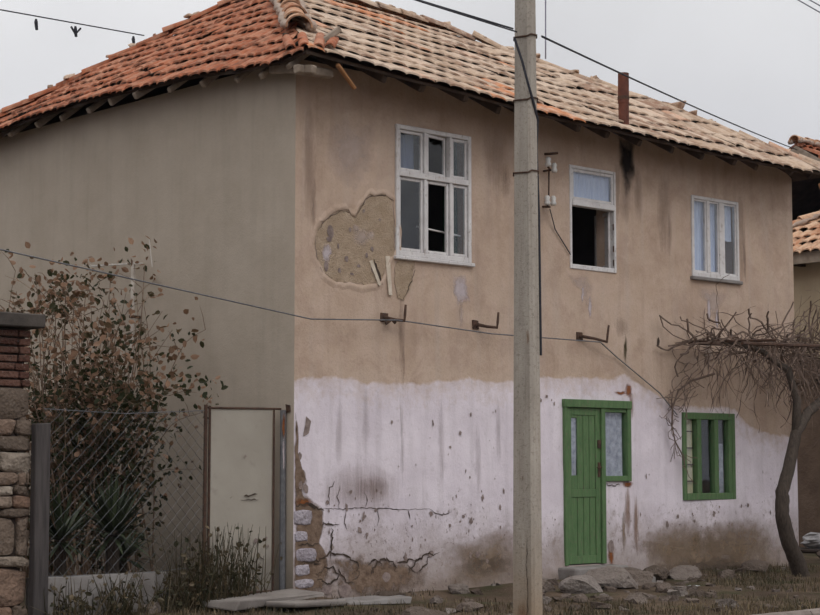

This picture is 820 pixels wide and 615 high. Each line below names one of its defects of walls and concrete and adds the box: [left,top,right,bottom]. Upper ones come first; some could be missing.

peeling [308,188,415,300]
spalling [294,417,440,598]
crack [323,481,449,529]
rust [623,500,637,544]
water stain [649,526,766,570]